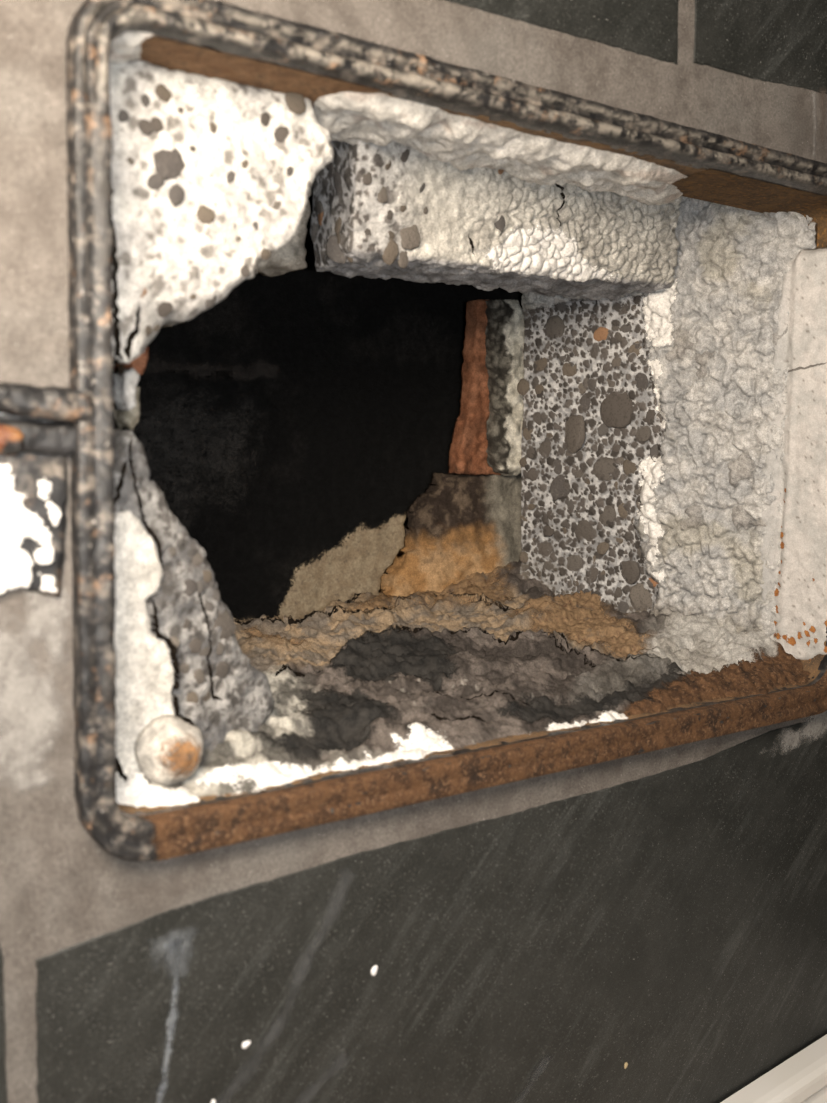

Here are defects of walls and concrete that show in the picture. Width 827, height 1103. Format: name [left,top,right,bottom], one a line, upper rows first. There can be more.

crack [111,190,140,378]
peeling [0,464,62,594]
crack [114,438,163,571]
spalling [448,299,501,475]
spalling [517,293,666,614]
crack [116,757,128,782]
crack [149,597,197,728]
corrosion [138,526,827,861]
efflorescence [157,935,187,1103]